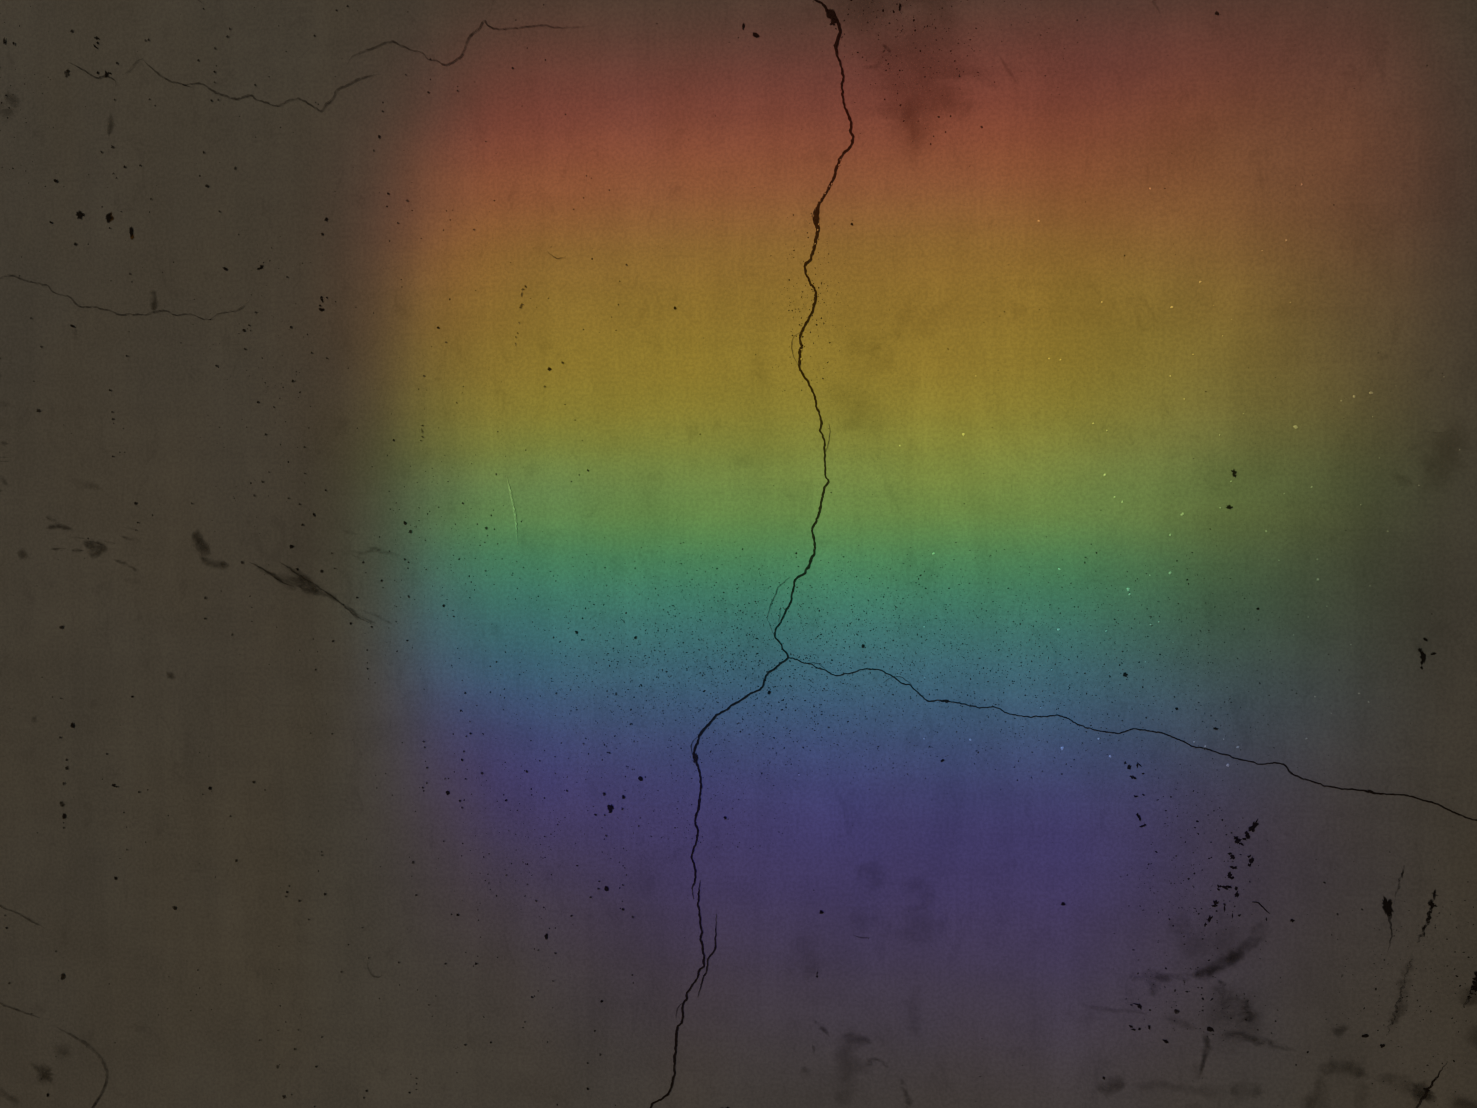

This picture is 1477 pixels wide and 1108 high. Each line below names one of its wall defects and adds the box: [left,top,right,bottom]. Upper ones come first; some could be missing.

crack [442,20,541,66]
crack [650,0,1477,1108]